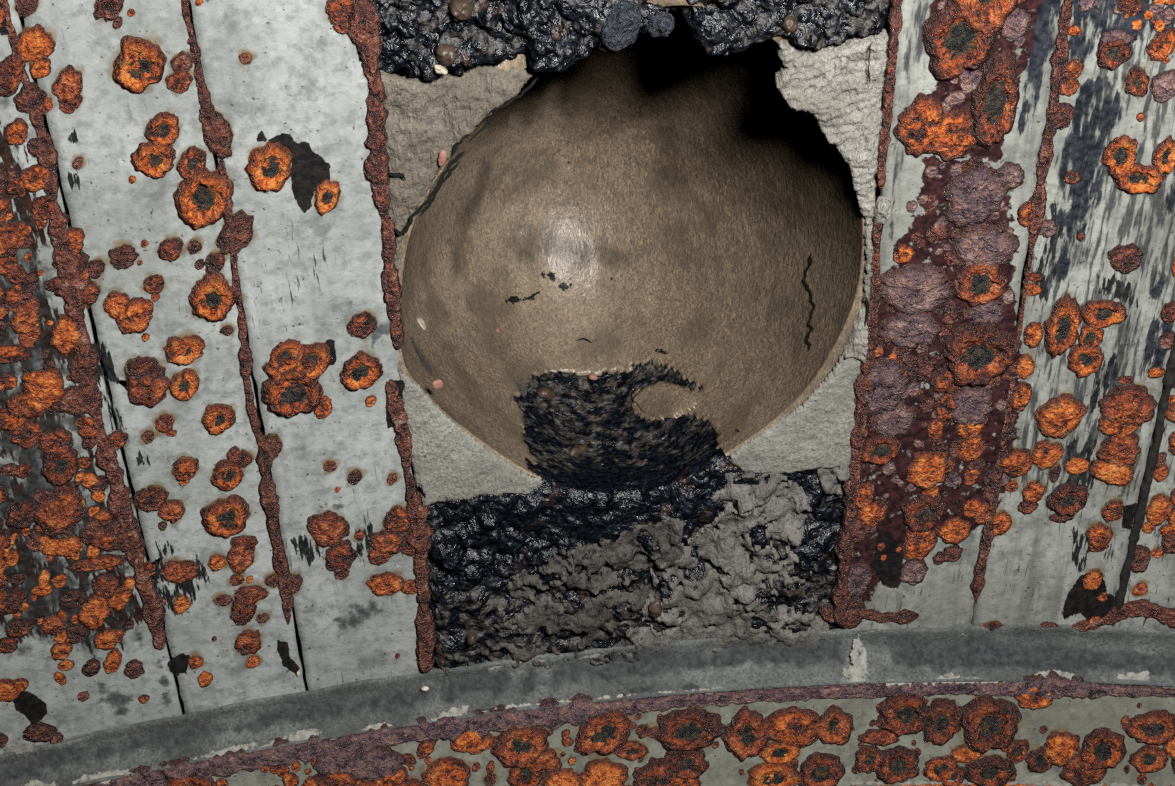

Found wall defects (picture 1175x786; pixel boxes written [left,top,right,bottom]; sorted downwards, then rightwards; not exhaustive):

spalling [433,65,448,75]
water stain [1018,0,1088,135]
water stain [1029,75,1122,304]
corrosion [0,0,437,688]
corrosion [819,0,1175,632]
water stain [1096,270,1167,309]
water stain [1143,318,1173,369]
peeling [633,381,697,420]
water stain [1062,522,1116,621]
peeling [277,640,300,676]
corrosion [0,721,64,748]
corrosion [83,670,1175,786]